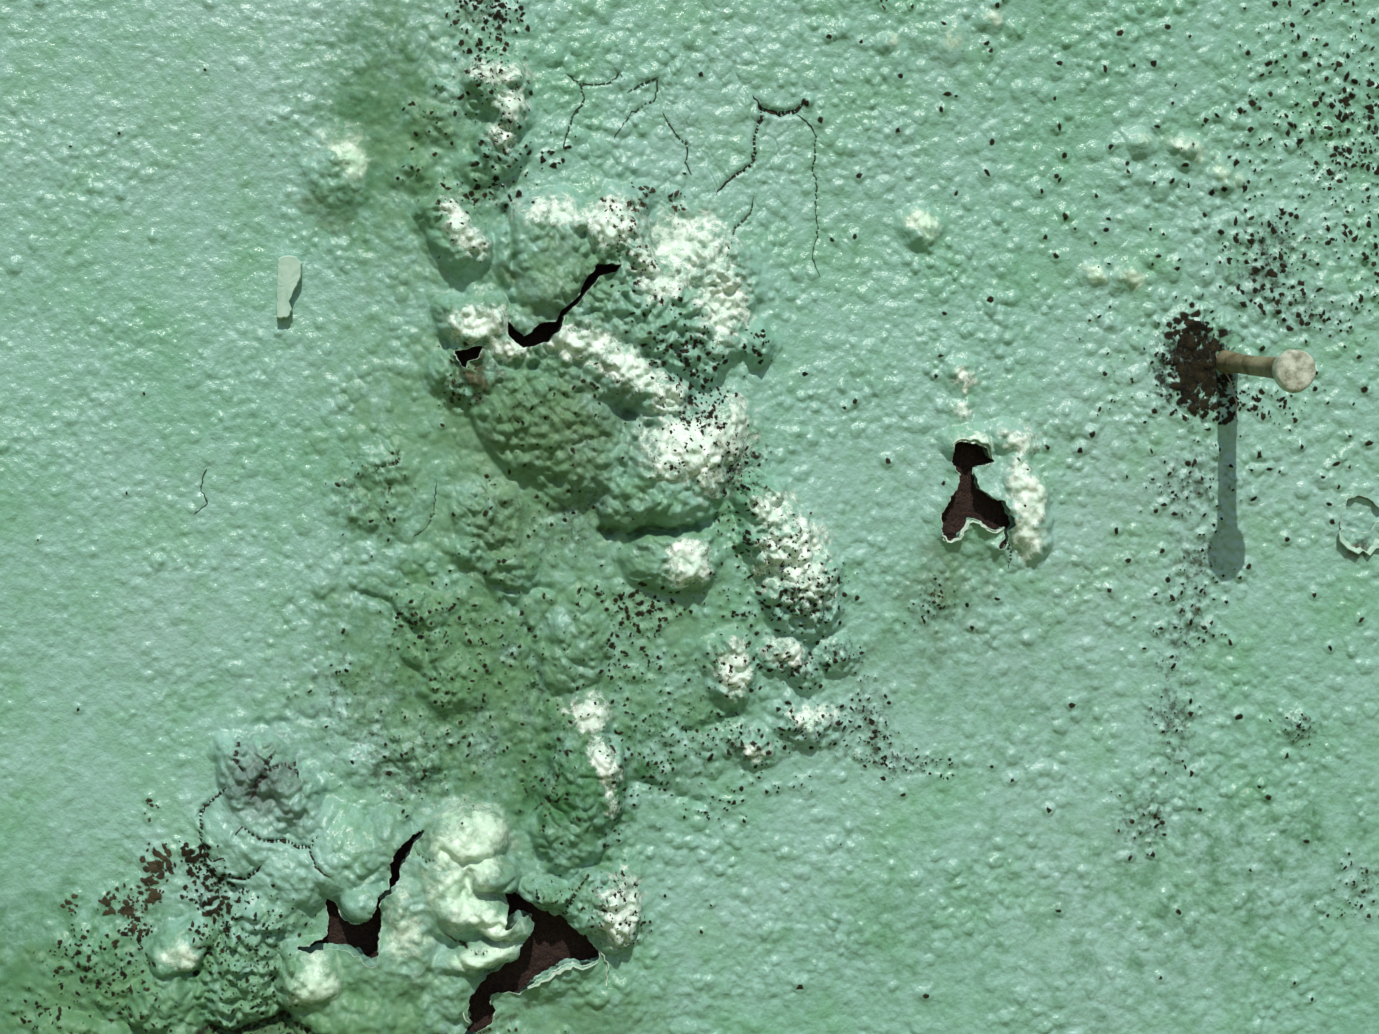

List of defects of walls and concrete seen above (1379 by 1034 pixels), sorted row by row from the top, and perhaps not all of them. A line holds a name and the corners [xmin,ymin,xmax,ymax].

peeling [940,438,1016,550]
crack [188,1010,313,1034]
peeling [297,829,424,968]
peeling [463,891,609,1034]